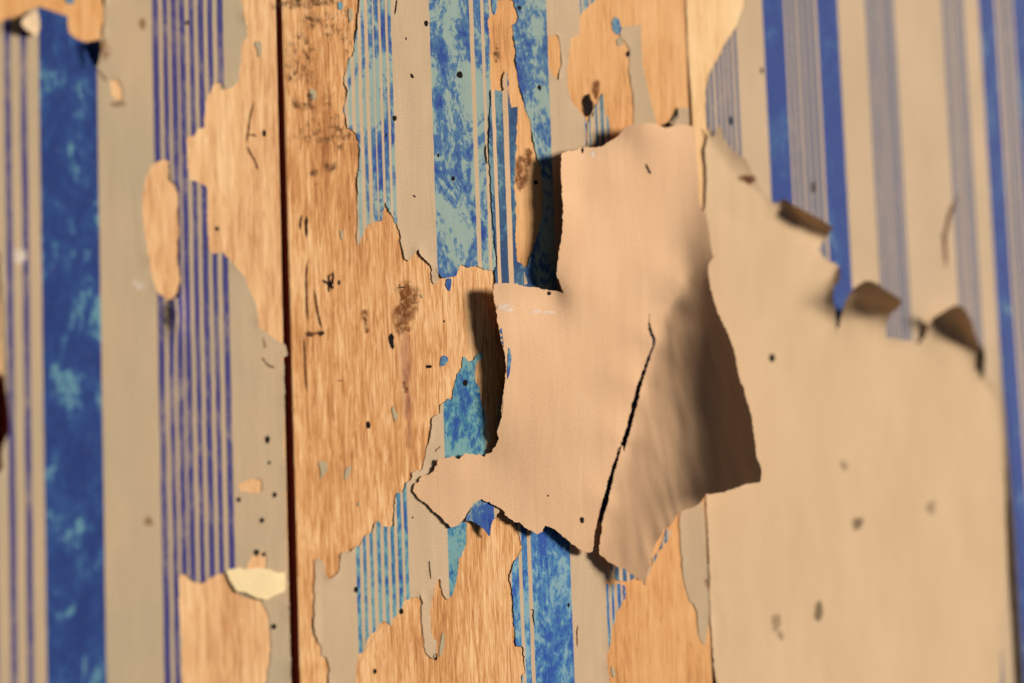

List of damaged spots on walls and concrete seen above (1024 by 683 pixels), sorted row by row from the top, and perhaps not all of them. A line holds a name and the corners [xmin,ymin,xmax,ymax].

peeling [0,0,105,68]
peeling [142,159,181,300]
peeling [178,0,762,683]